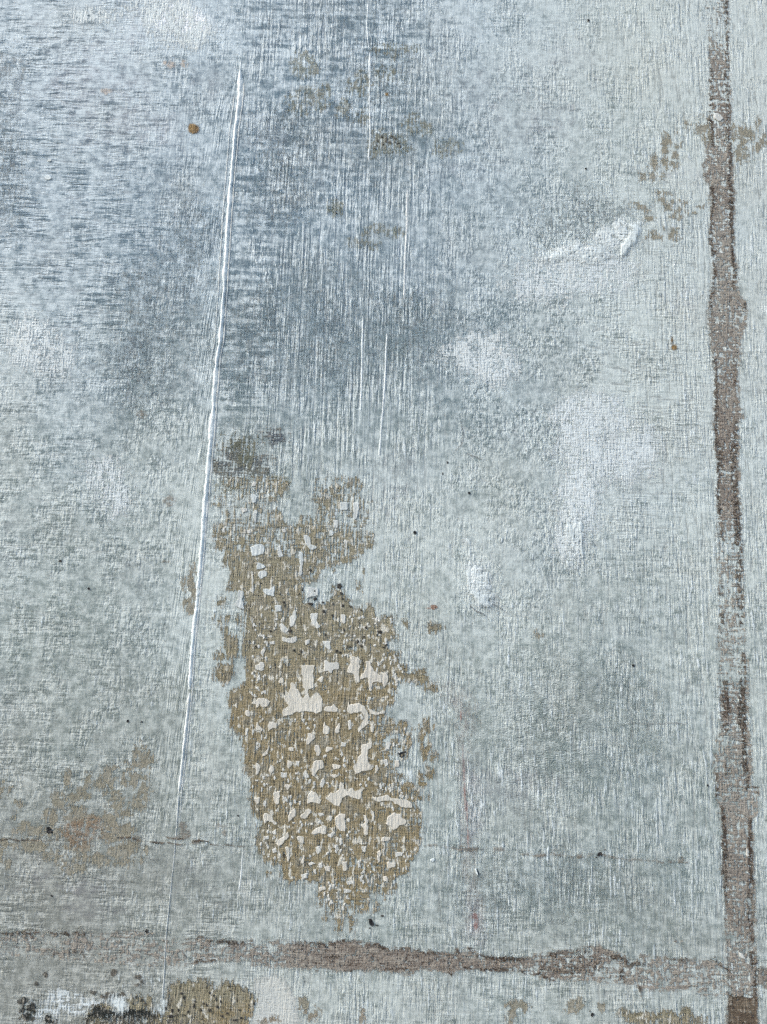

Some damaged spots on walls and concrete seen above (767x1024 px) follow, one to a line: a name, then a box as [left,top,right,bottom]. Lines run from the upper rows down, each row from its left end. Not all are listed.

peeling [693,0,767,675]
damp [90,975,144,1001]
crack [119,836,245,861]
peeling [211,475,439,936]
peeling [0,677,767,1024]
peeling [427,605,446,635]